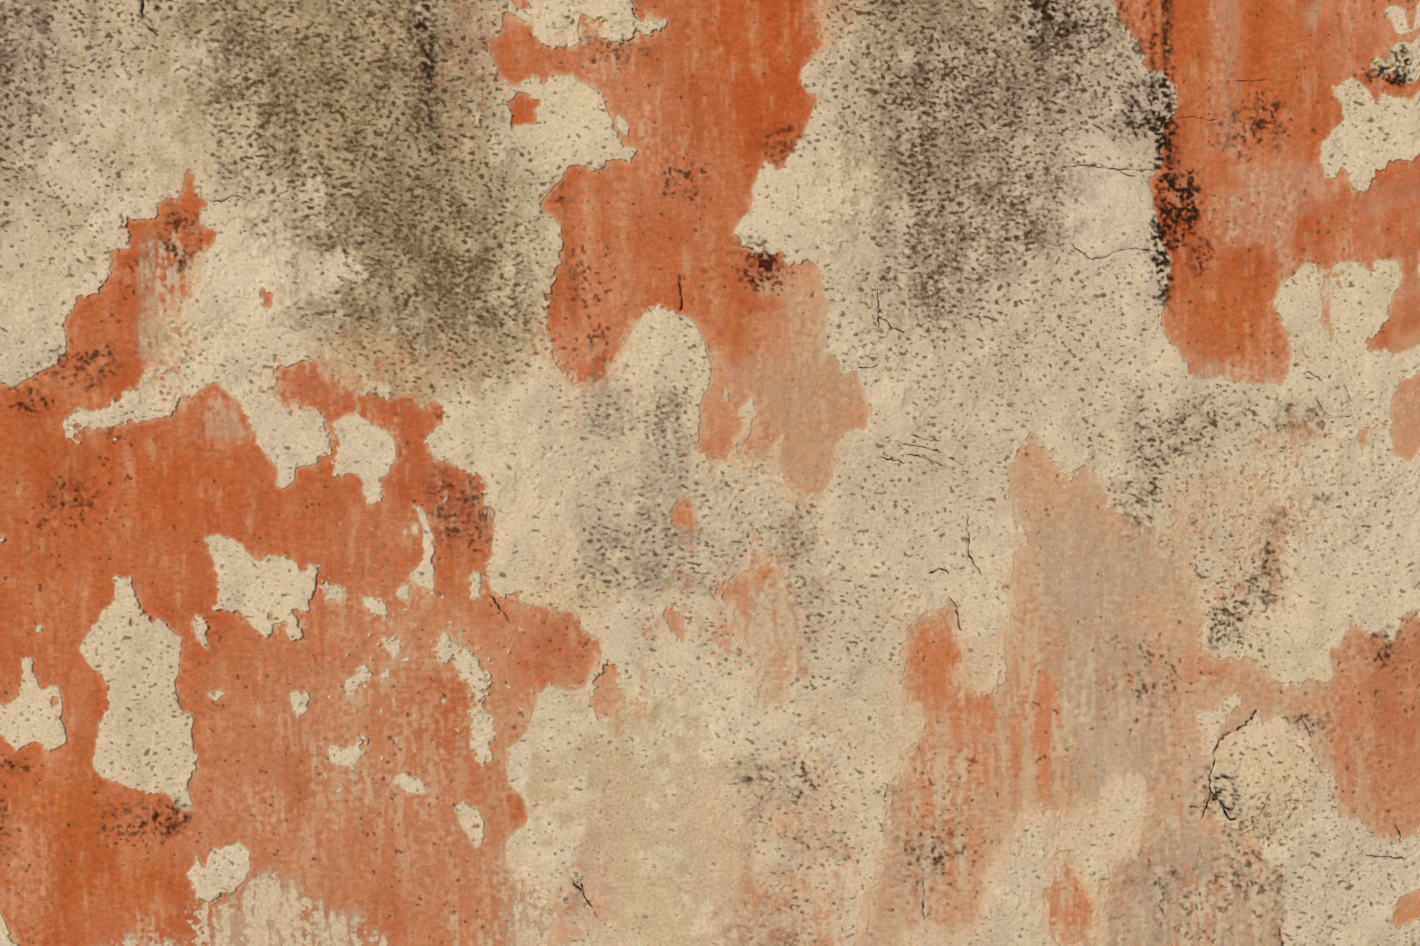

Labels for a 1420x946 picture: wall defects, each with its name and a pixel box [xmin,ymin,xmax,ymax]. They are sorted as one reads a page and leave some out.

crack [141,0,158,36]
peeling [0,0,668,489]
damp [207,0,520,371]
damp [745,237,775,287]
damp [881,0,1119,317]
damp [1113,0,1207,301]
peeling [404,0,1420,946]
peeling [0,657,68,752]
peeling [80,534,346,811]
peeling [116,842,387,946]
crack [1190,710,1257,821]
crack [1366,824,1407,860]